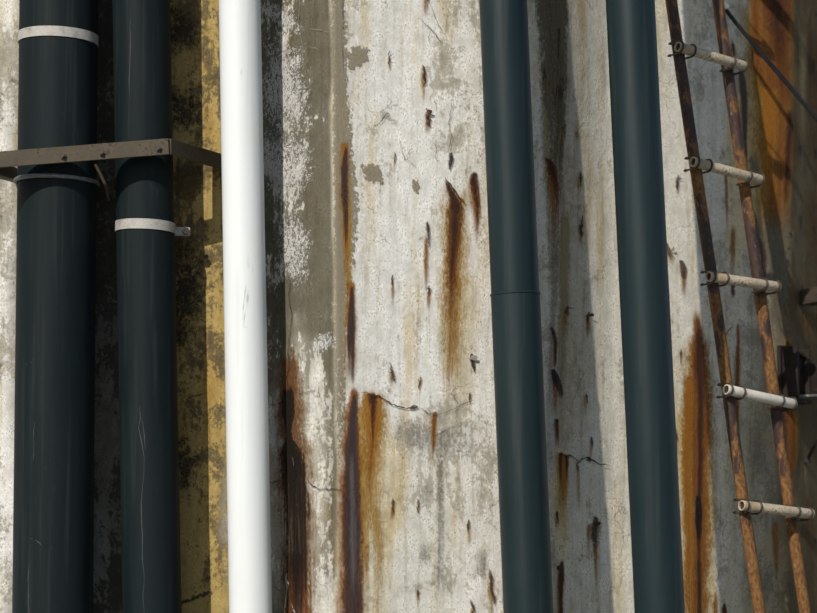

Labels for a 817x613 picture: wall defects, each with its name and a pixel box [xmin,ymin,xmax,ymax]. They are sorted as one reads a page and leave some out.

water stain [261,0,314,288]
water stain [274,349,316,613]
water stain [313,332,336,352]
corrosion [339,143,356,377]
corrosion [337,389,387,613]
crack [362,392,473,416]
corrosion [441,172,480,361]
water stain [535,0,568,359]
corrosion [545,158,560,226]
crack [559,453,610,466]
corrosion [676,314,727,613]
corrosion [739,0,807,278]